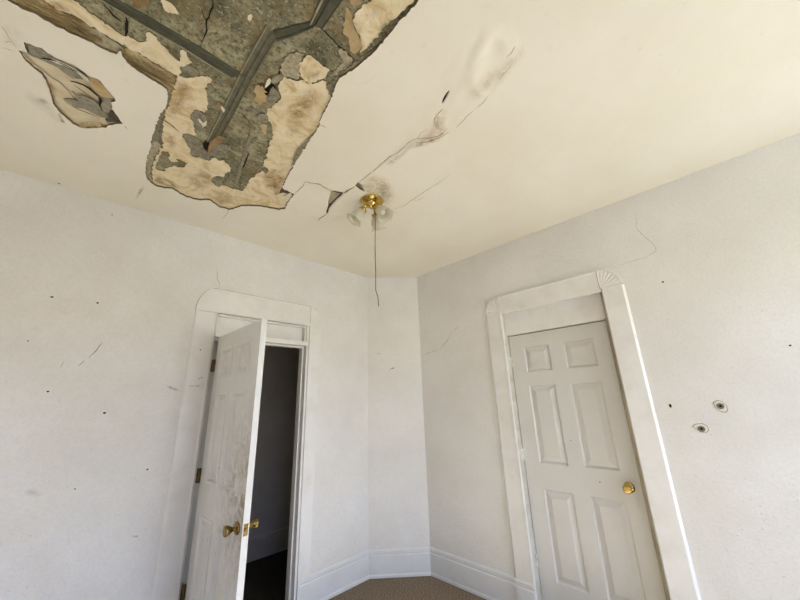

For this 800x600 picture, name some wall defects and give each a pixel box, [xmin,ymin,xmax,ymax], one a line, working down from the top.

spalling [181,64,200,77]
peeling [326,0,399,96]
spalling [146,92,171,181]
spalling [183,110,231,161]
peeling [246,78,281,141]
crack [298,99,486,193]
spalling [327,191,342,211]